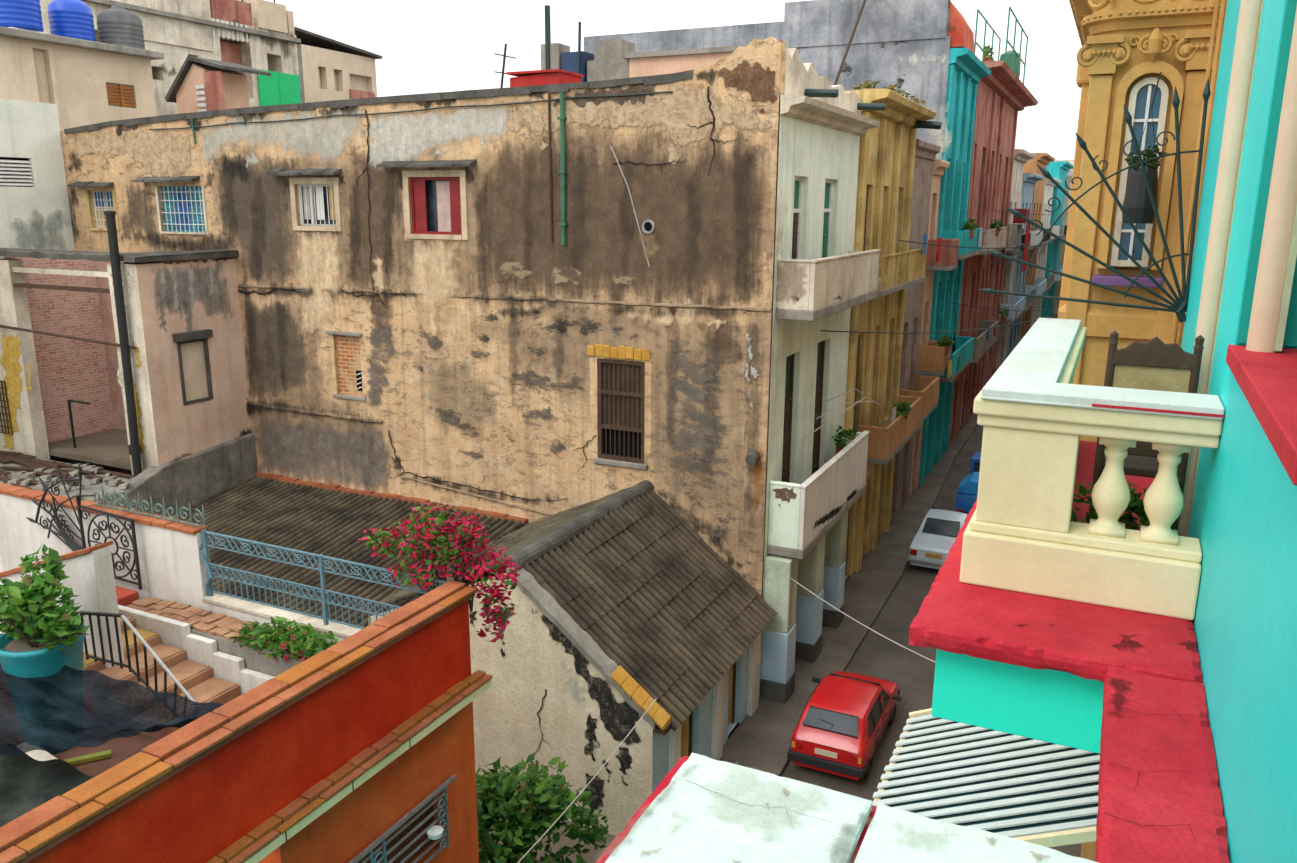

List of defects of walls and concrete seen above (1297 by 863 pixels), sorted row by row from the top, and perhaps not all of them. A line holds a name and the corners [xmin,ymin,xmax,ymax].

damp [321,106,358,118]
peeling [72,61,777,177]
damp [418,99,456,108]
crack [613,86,737,177]
damp [698,70,715,83]
crack [238,109,417,313]
peeling [0,332,32,450]
damp [122,135,761,566]
crack [535,689,550,754]